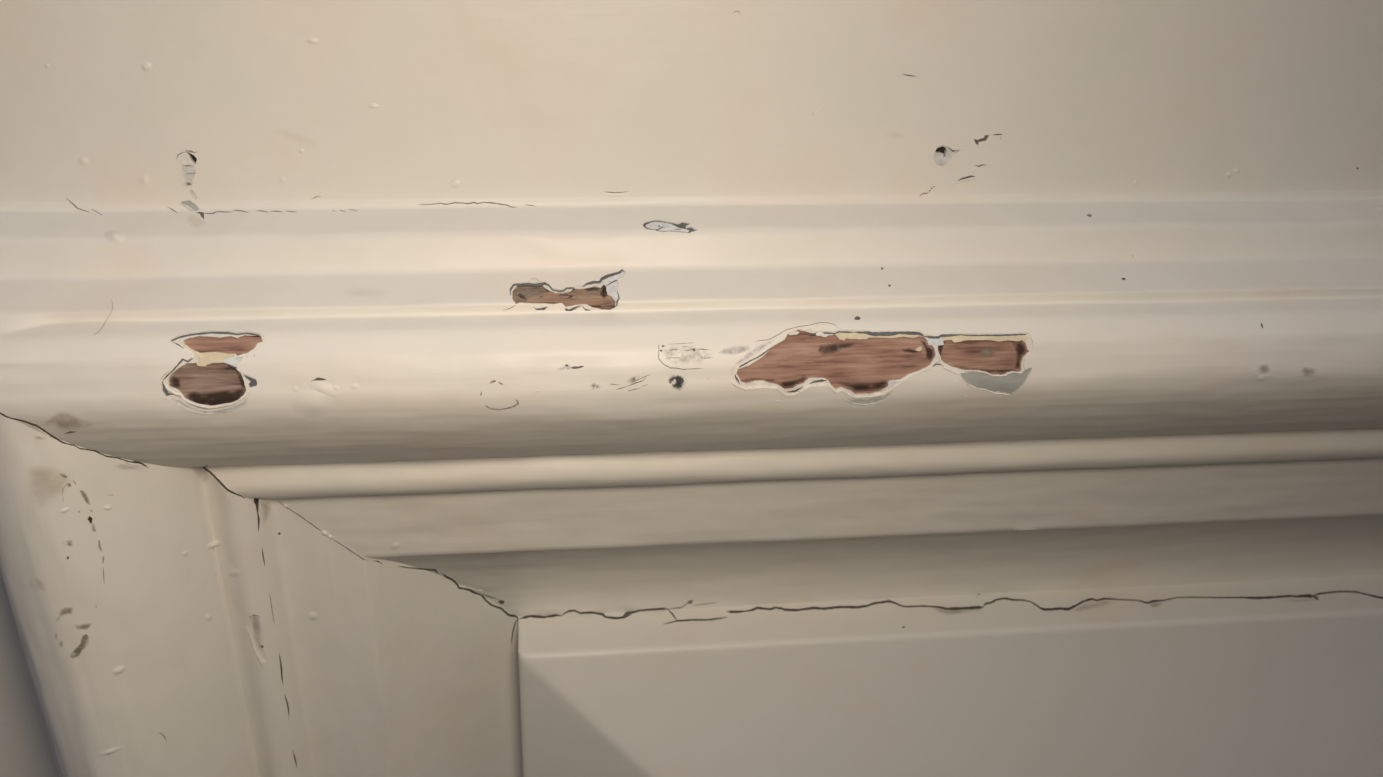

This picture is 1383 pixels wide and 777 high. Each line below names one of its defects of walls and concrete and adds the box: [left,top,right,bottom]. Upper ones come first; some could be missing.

peeling [505,270,626,311]
peeling [161,331,264,415]
peeling [732,322,1032,406]
crack [0,412,147,467]
crack [202,465,1383,714]